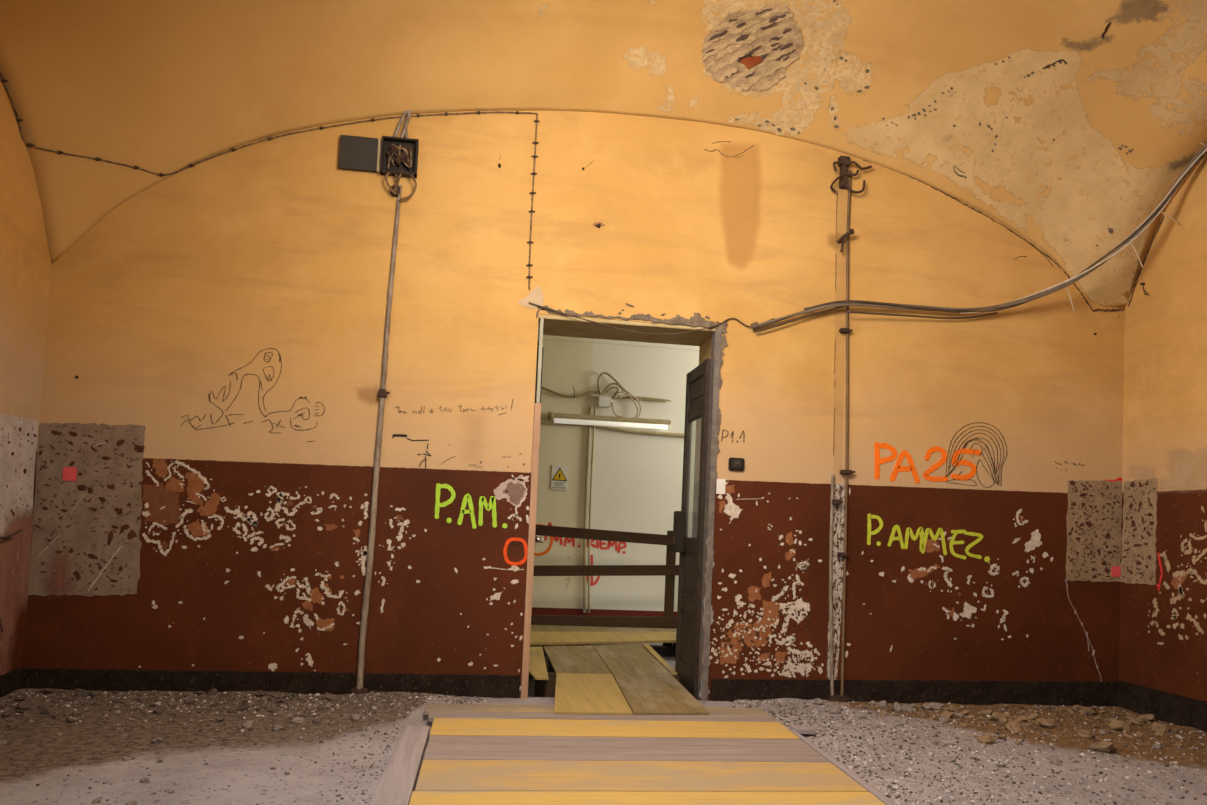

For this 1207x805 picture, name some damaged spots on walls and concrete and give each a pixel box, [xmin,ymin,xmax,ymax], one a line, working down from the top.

peeling [623,46,699,118]
peeling [700,0,1195,306]
spalling [536,303,728,389]
peeling [0,419,427,671]
peeling [486,578,523,647]
peeling [493,471,530,529]
peeling [699,472,824,698]
peeling [892,509,1053,640]
peeling [1068,480,1207,645]